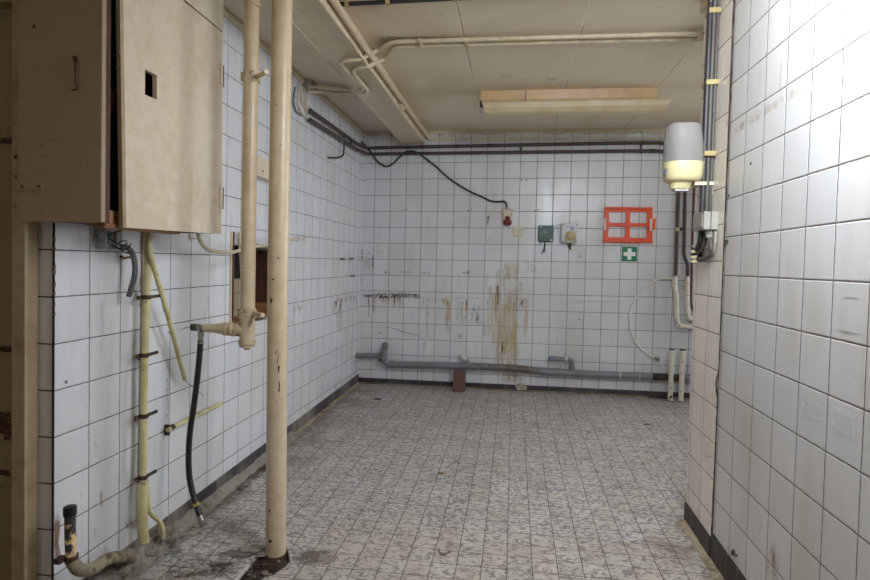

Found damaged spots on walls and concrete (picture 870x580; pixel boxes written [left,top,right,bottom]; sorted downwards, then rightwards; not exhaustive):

corrosion [364,293,419,305]